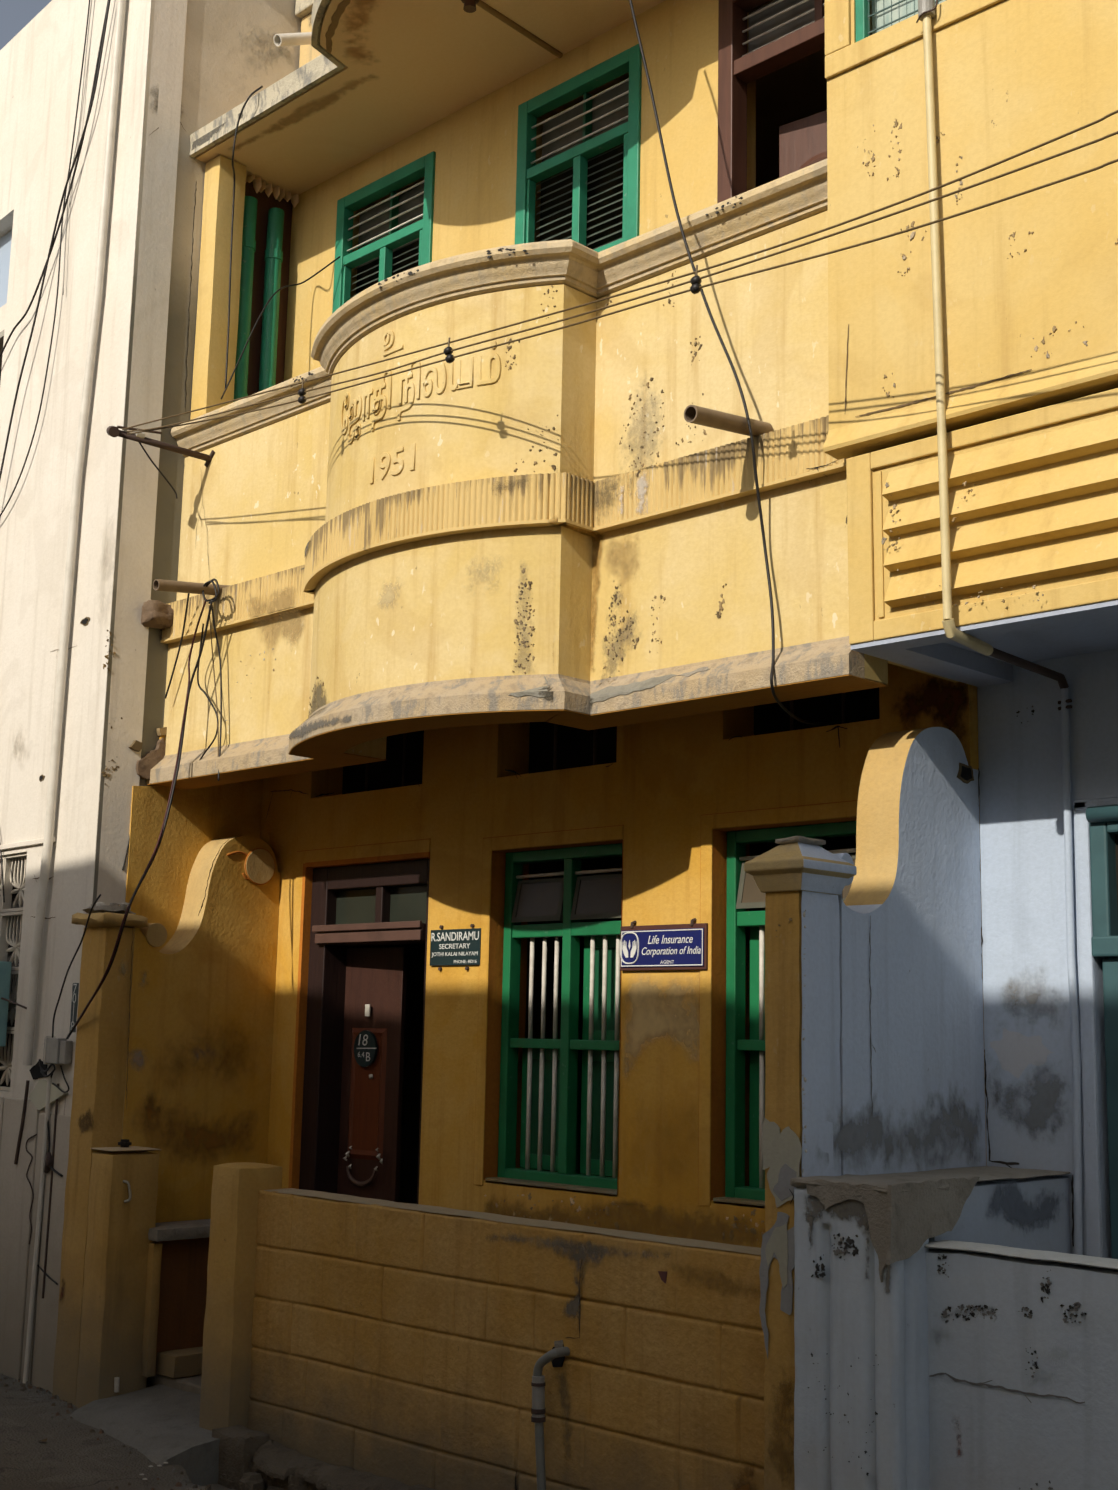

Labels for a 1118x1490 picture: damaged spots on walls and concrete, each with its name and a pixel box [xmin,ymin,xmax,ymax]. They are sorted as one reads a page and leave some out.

water stain [597,474,648,513]
water stain [551,518,634,662]
water stain [833,1098,978,1163]
water stain [994,1068,1064,1133]
water stain [991,1183,1059,1227]
water stain [487,1203,756,1317]
flaking render [811,1233,859,1278]
crack [929,1373,1085,1404]